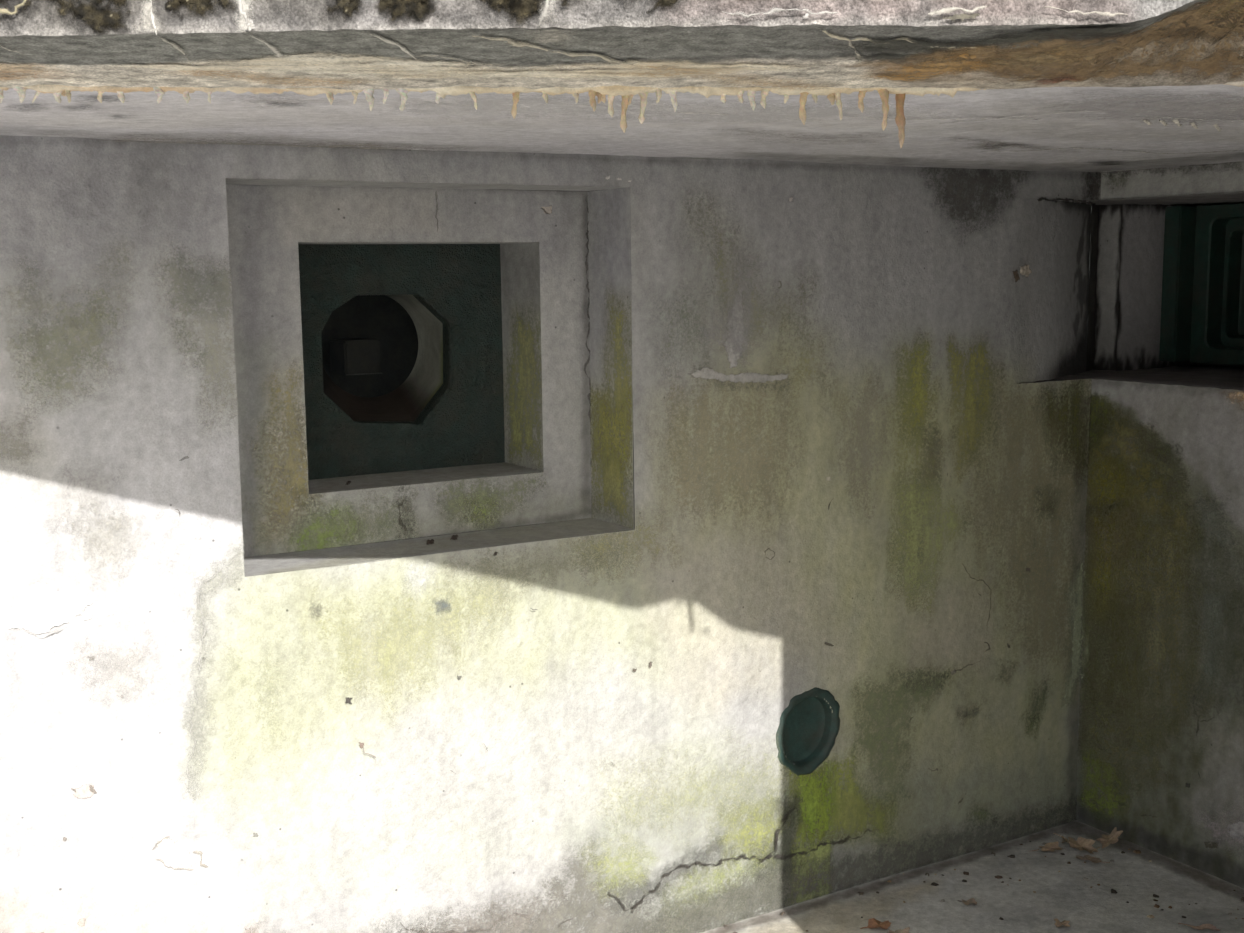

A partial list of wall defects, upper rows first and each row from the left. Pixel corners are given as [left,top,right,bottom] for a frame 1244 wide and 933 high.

water stain [0,53,1244,143]
water stain [891,337,1091,677]
crack [608,804,875,914]